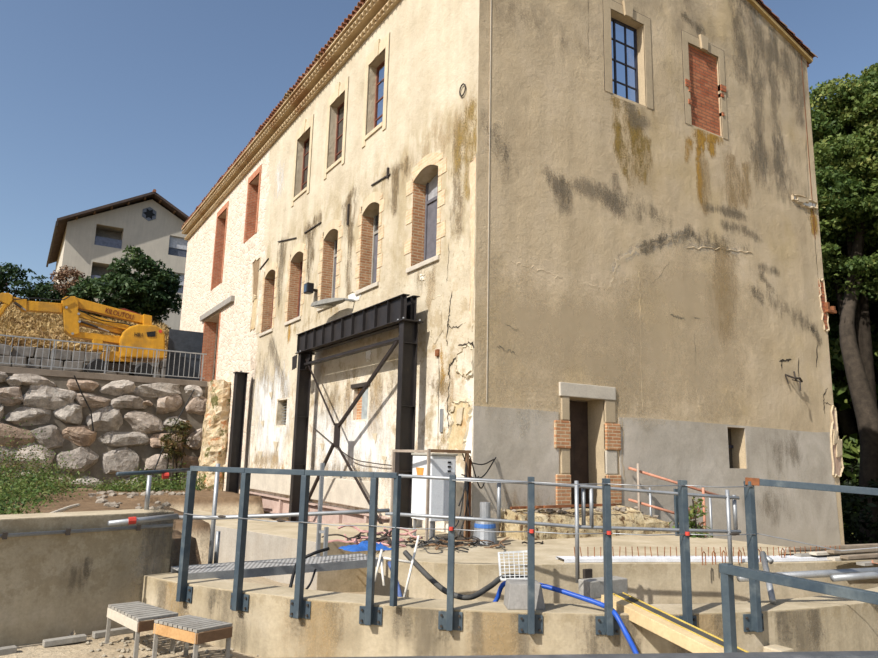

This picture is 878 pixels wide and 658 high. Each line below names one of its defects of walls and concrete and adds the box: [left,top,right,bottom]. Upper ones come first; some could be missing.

mould [453,102,477,232]
leakage [613,99,650,182]
leakage [701,0,805,228]
crack [437,244,474,445]
crack [779,346,818,374]
flaking render [818,278,830,332]
spalling [830,405,844,478]